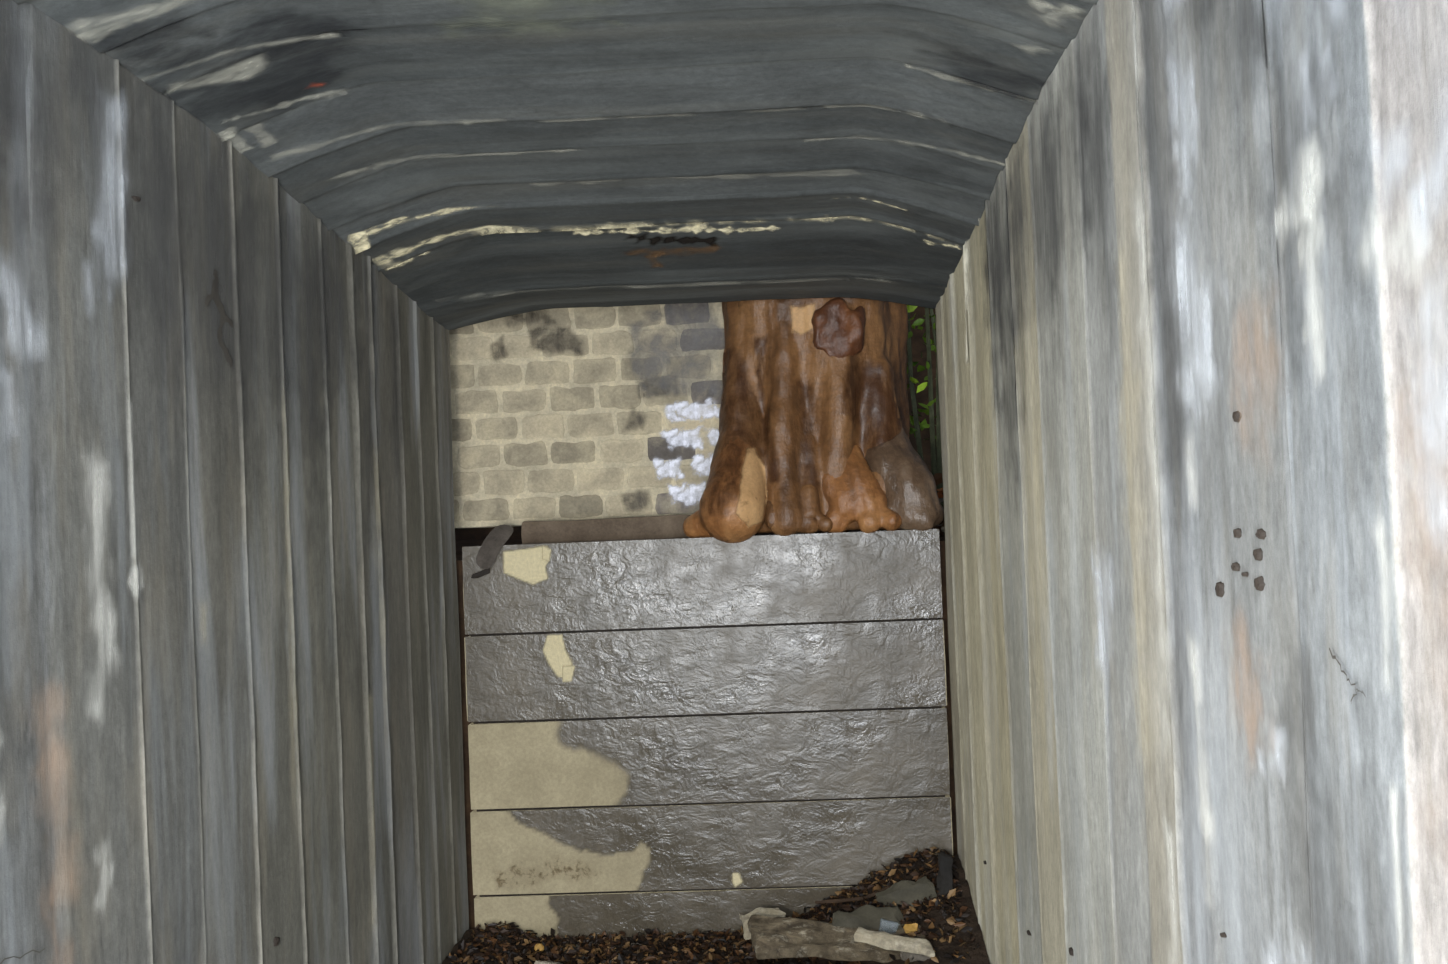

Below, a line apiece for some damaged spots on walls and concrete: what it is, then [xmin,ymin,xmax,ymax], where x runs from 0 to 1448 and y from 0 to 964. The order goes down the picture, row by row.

spalling [351,208,529,270]
spalling [566,222,776,246]
peeling [503,546,551,584]
peeling [543,635,575,682]
crack [1329,648,1365,704]